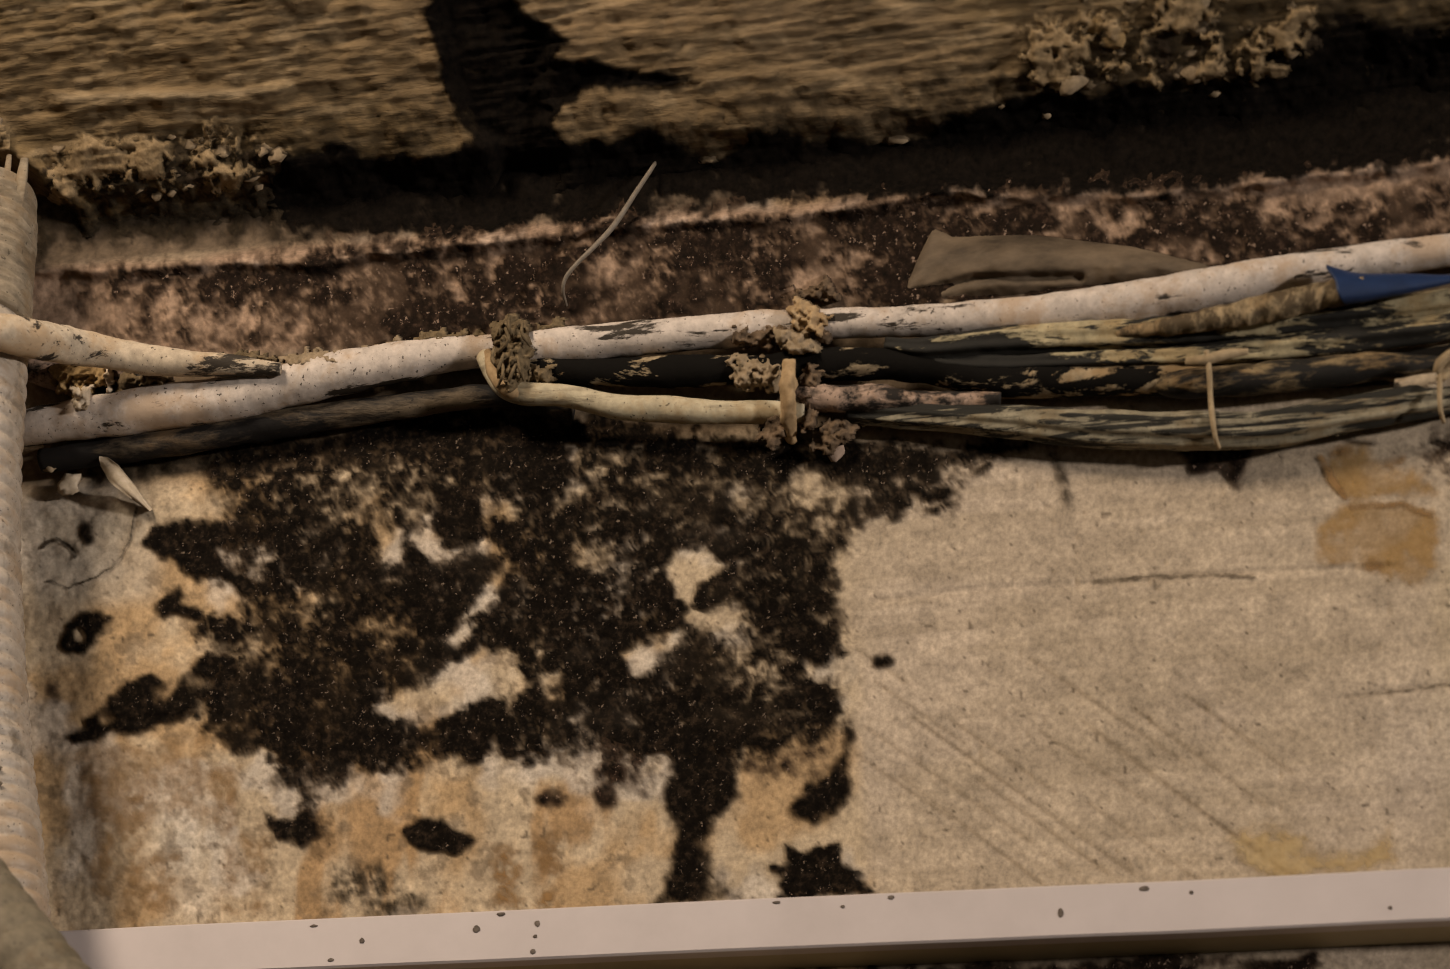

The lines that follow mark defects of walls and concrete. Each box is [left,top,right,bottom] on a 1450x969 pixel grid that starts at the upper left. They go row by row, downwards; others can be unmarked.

spalling [1018,0,1324,98]
crack [423,0,692,191]
spalling [0,117,11,161]
spalling [698,156,718,164]
spalling [885,135,910,145]
damp [60,408,1033,905]
damp [333,863,424,915]
damp [902,951,1323,969]